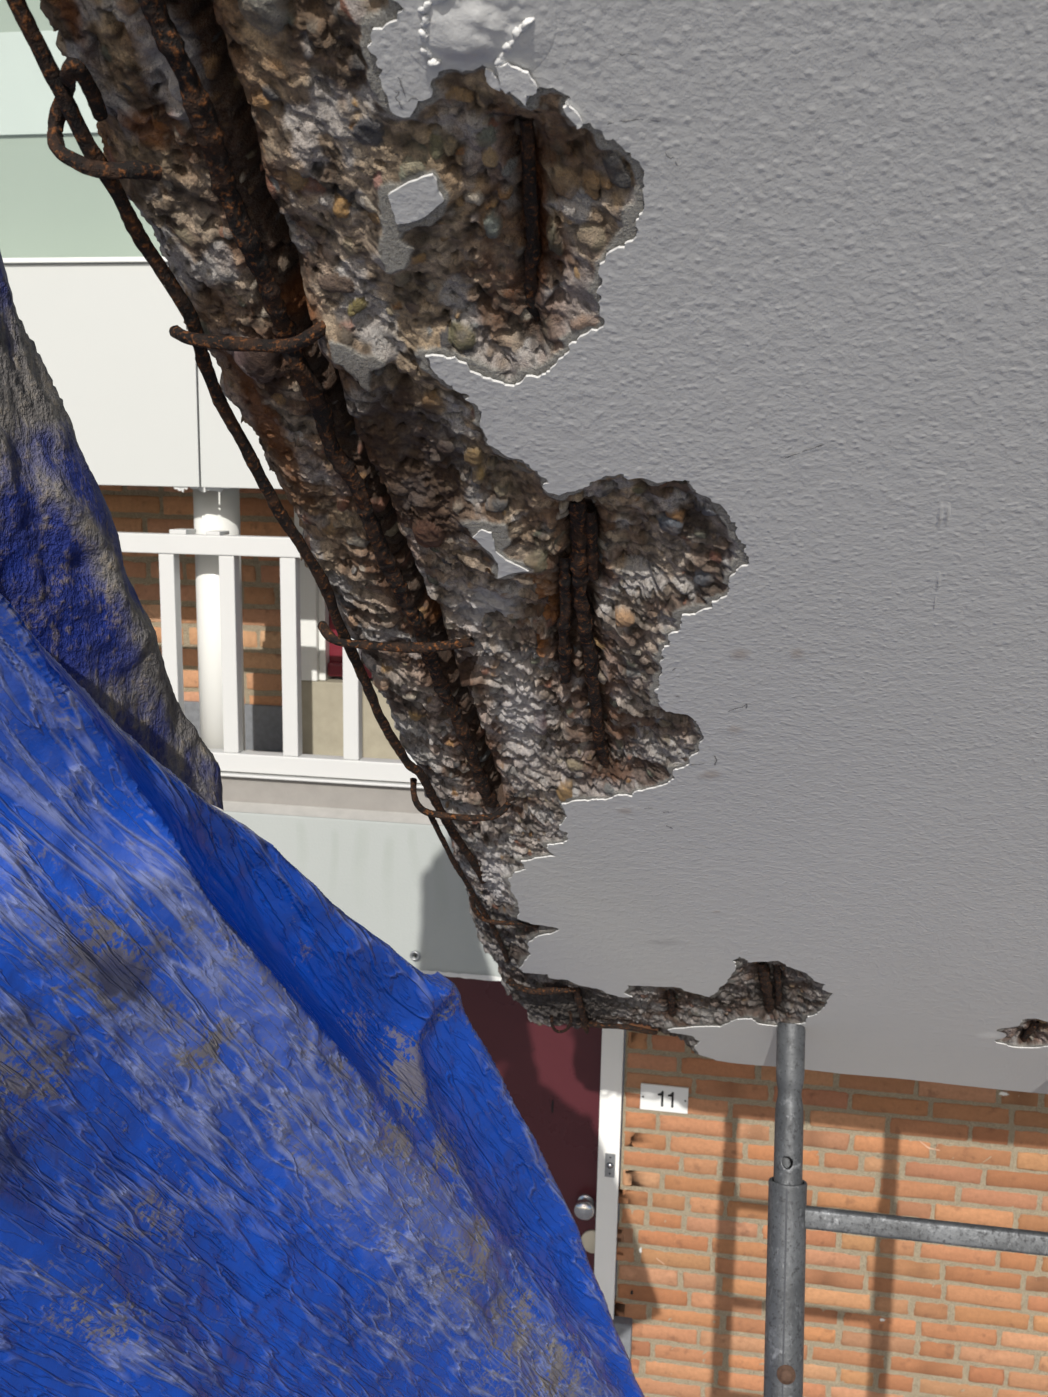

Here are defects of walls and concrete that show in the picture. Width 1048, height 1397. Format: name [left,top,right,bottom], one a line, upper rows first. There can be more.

spalling [40,0,76,58]
corrosion [45,0,186,158]
spalling [80,0,260,330]
corrosion [509,104,556,323]
corrosion [181,250,505,637]
spalling [199,0,749,994]
corrosion [447,649,519,806]
spalling [623,957,833,1057]
spalling [995,1018,1048,1047]